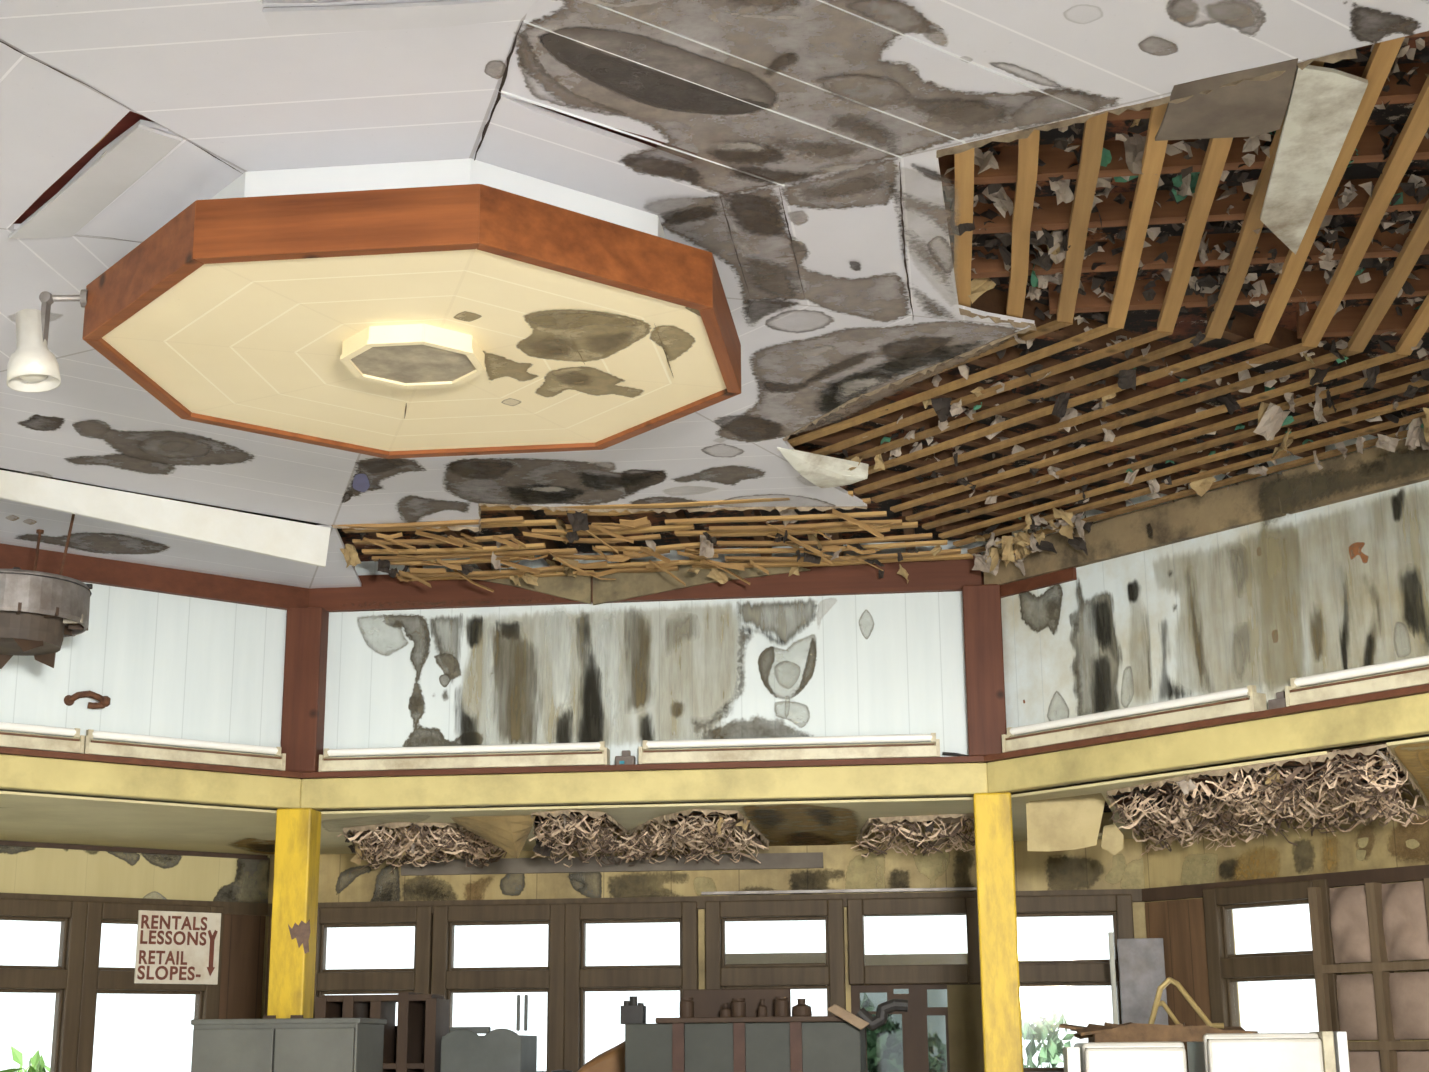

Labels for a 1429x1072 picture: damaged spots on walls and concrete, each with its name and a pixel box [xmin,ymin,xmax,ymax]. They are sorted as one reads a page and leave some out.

leakage [1344,2,1421,44]
leakage [397,0,1119,523]
peeling [968,278,996,303]
peeling [1026,228,1071,301]
leakage [19,414,254,475]
peeling [848,429,916,471]
peeling [1216,340,1429,476]
peeling [751,509,919,584]
peeling [972,490,1094,576]
leakage [1215,450,1429,680]
leakage [358,599,817,747]
leakage [1019,581,1184,721]